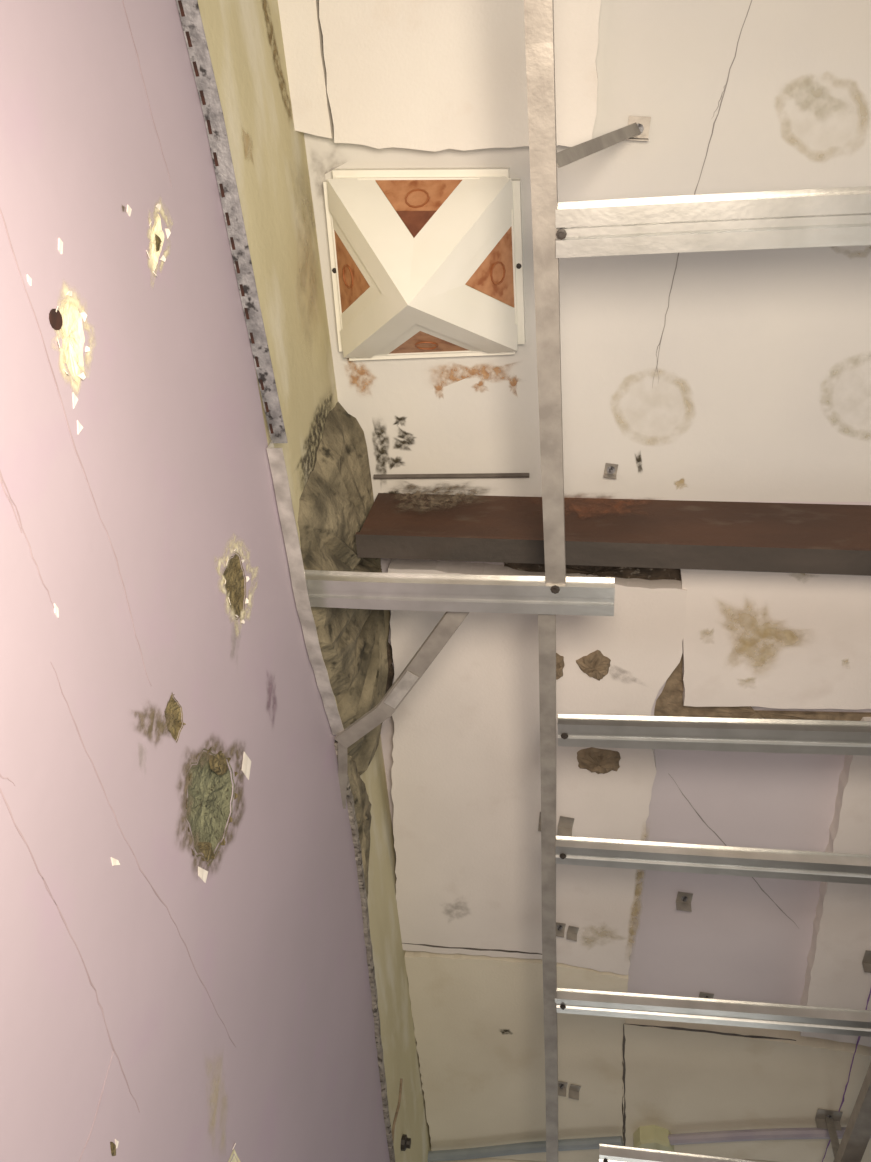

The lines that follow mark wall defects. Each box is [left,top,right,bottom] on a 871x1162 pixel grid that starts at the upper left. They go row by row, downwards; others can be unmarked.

peeling [49,285,92,434]
rust [435,366,517,391]
crack [0,208,152,686]
leakage [374,417,414,474]
peeling [298,396,530,573]
rust [564,495,635,517]
spalling [135,693,186,743]
spalling [217,538,257,634]
peeling [311,607,394,729]
leakage [731,613,797,666]
spalling [180,741,251,883]
peeling [347,722,383,899]